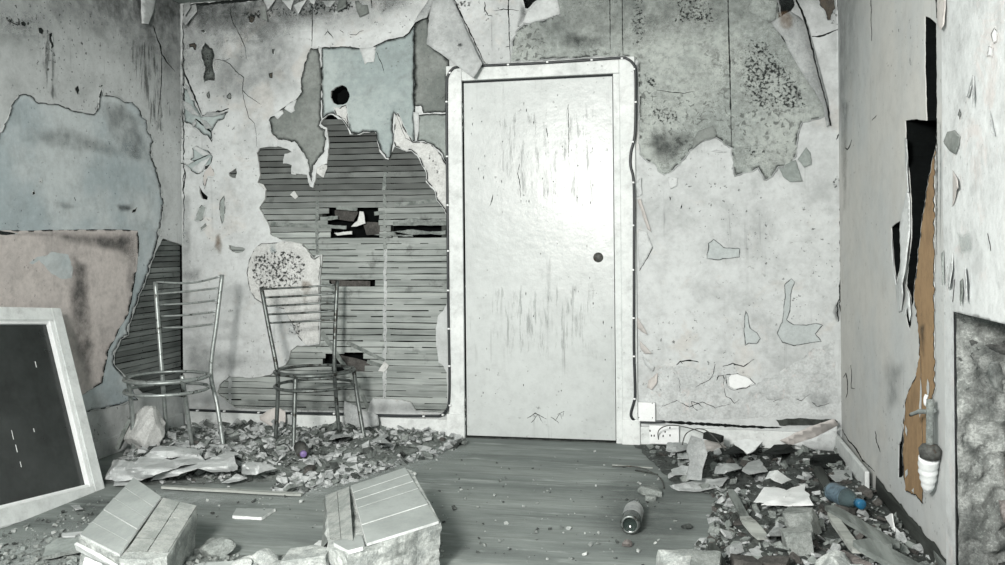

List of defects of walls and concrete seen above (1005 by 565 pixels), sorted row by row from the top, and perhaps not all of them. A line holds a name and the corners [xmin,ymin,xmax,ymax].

peeling [819,0,837,21]
water stain [745,40,805,111]
peeling [692,125,725,152]
peeling [779,148,812,182]
flaking render [217,14,449,413]
peeling [0,86,183,413]
peeling [707,239,740,260]
water stain [252,252,305,288]
peeling [645,279,839,421]